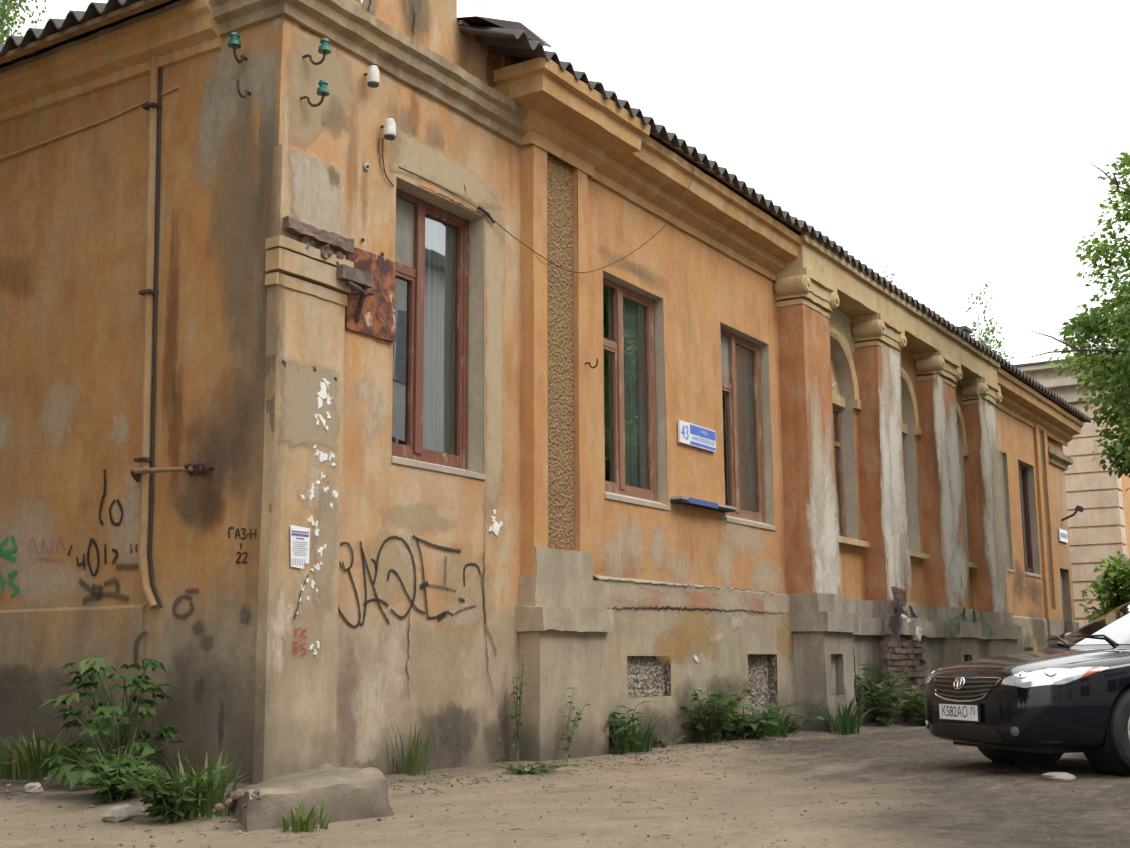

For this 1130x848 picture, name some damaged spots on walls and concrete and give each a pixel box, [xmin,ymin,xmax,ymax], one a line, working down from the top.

damp [200,41,277,163]
damp [410,0,428,37]
peeling [271,444,338,673]
peeling [314,378,333,431]
crack [592,578,788,614]
peeling [807,397,841,595]
peeling [879,341,928,725]
peeling [933,373,977,626]
peeling [979,393,1009,613]
damp [0,672,103,745]